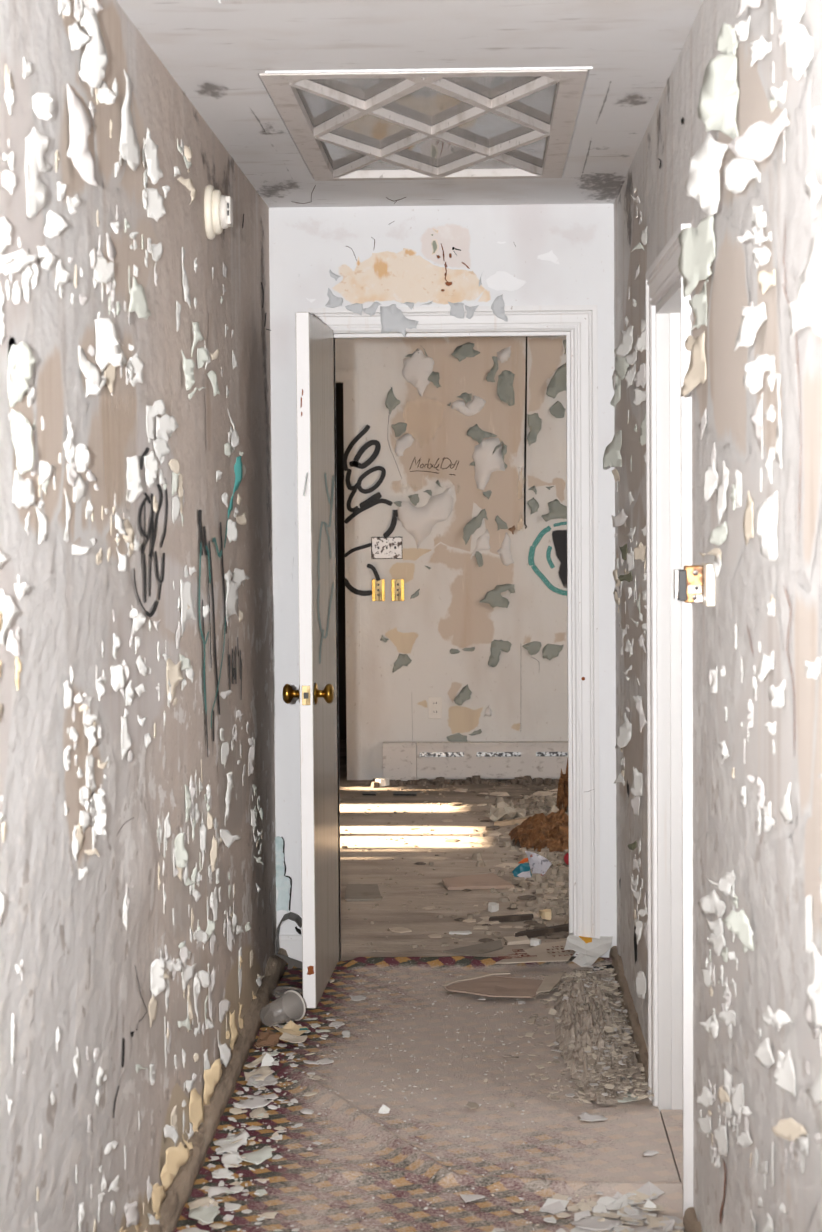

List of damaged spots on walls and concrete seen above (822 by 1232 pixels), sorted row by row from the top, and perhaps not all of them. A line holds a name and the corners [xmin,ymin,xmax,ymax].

peeling [11,1013,27,1076]
peeling [0,0,250,886]
peeling [73,683,291,1232]
peeling [325,222,567,673]
peeling [446,680,492,742]
peeling [603,181,648,1001]
peeling [678,0,822,1232]